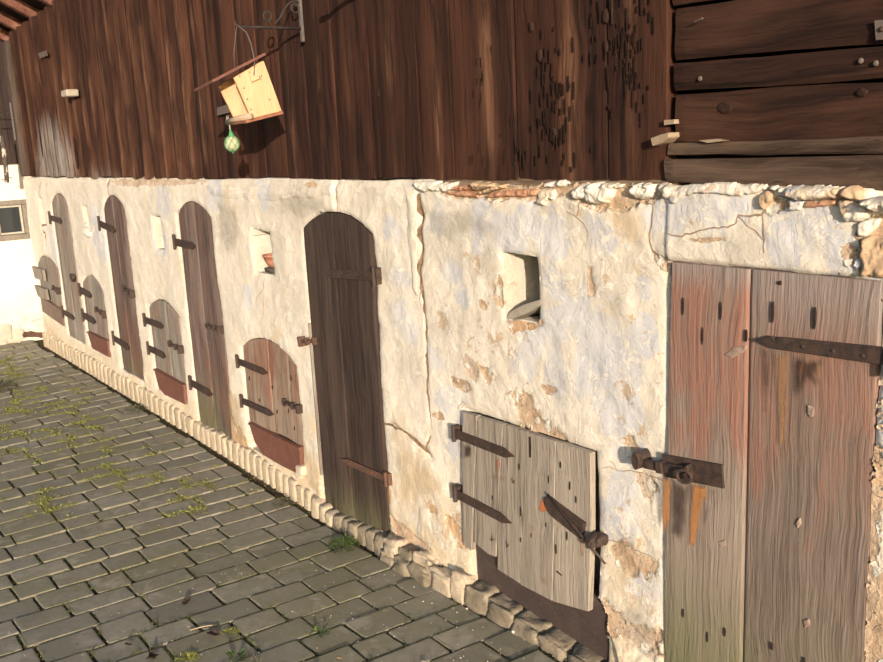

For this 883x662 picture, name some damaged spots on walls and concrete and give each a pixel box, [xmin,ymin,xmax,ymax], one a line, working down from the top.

spalling [440,181,669,213]
crack [641,184,876,273]
peeling [841,215,883,276]
crack [384,193,432,458]
spalling [505,382,566,441]
corrosion [662,479,706,544]
spalling [864,444,883,662]